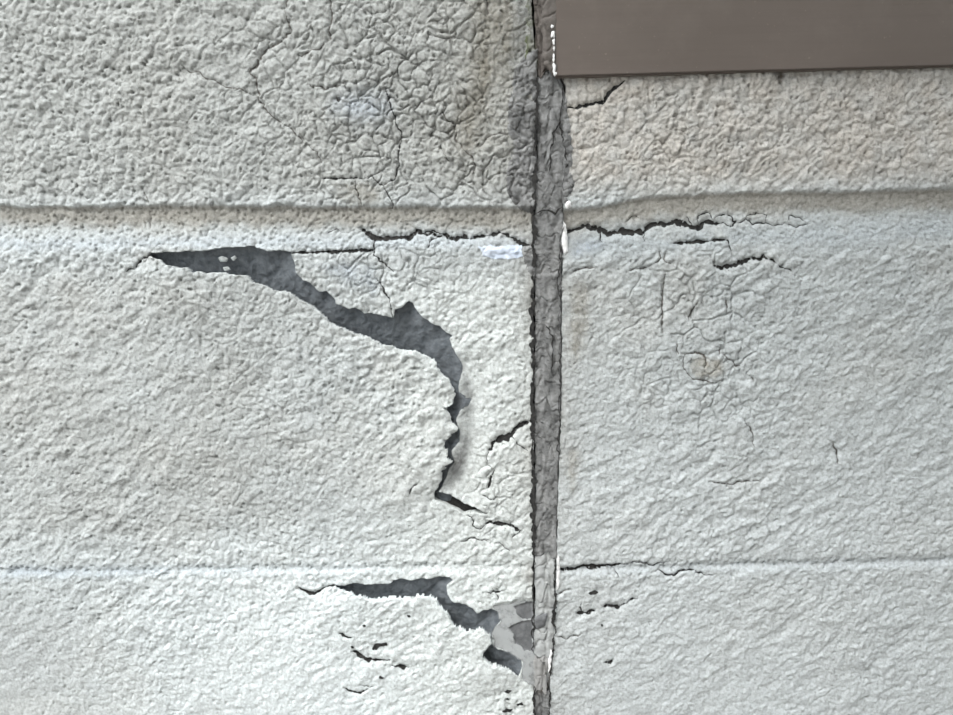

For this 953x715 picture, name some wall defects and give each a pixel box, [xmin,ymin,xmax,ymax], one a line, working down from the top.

crack [187,0,402,209]
spalling [150,246,480,511]
crack [292,78,806,715]
spalling [336,576,545,686]